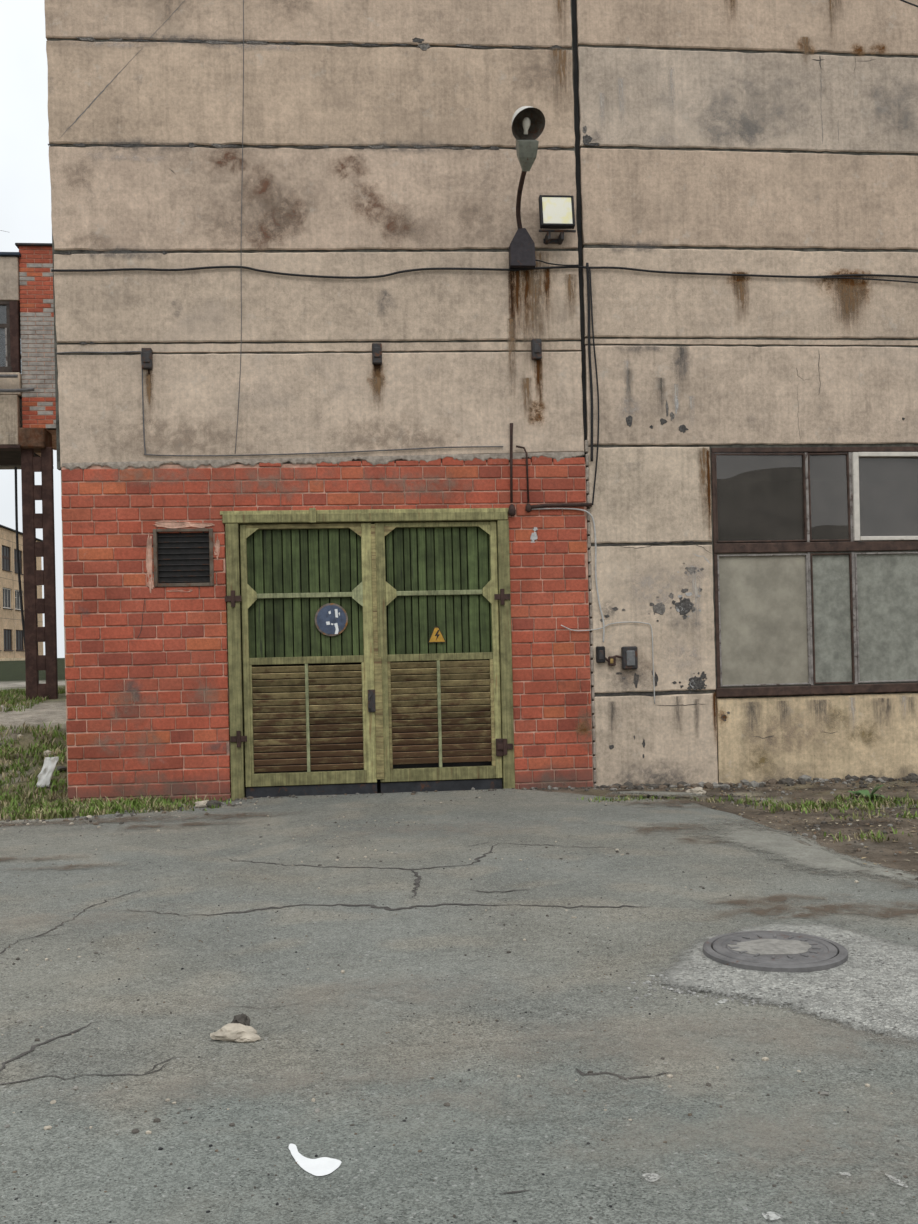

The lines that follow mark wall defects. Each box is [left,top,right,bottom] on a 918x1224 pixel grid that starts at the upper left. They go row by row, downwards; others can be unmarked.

leakage [213,151,244,170]
leakage [252,177,302,248]
leakage [357,188,410,234]
rust [567,274,575,308]
rust [729,272,748,311]
rust [822,271,870,318]
rust [508,251,550,424]
rust [370,364,384,401]
spalling [649,563,704,622]
spalling [616,670,707,694]